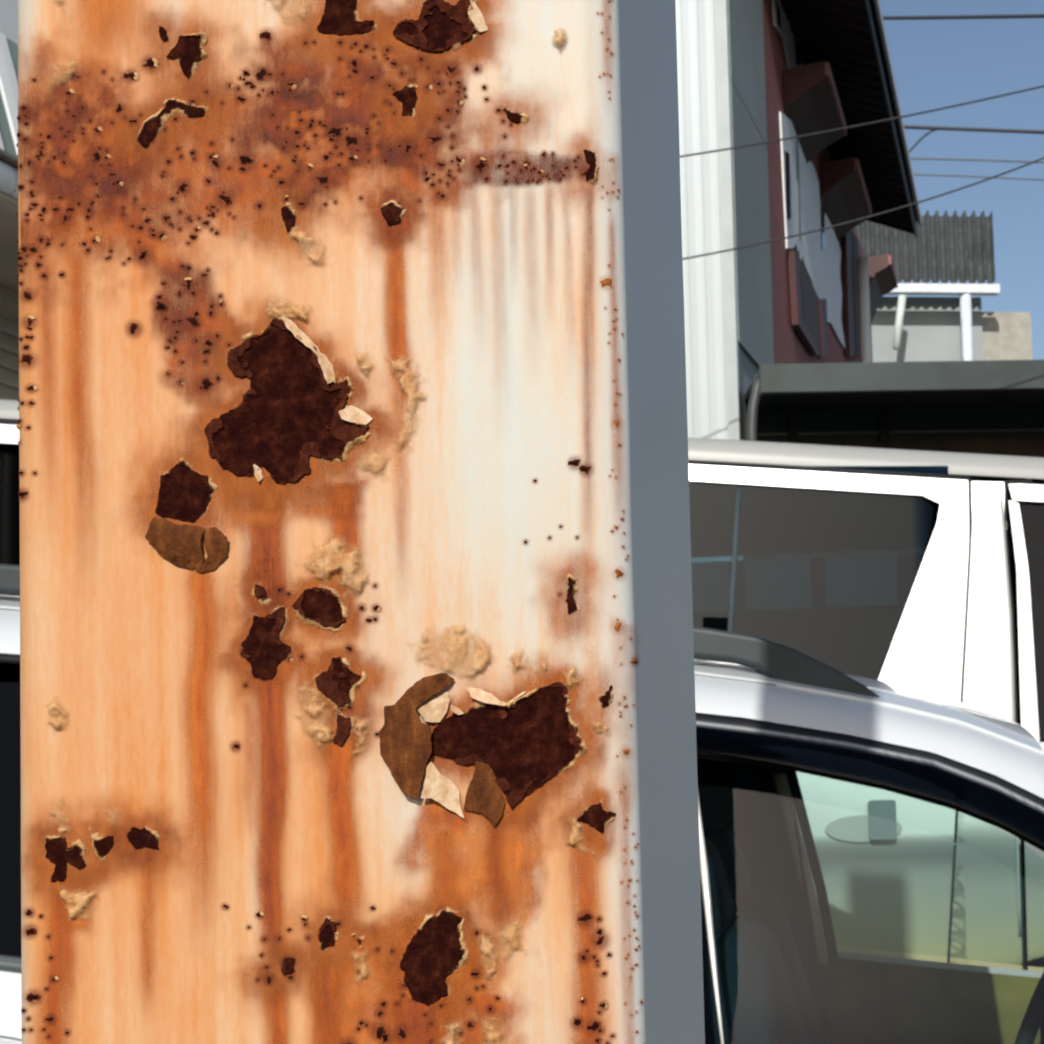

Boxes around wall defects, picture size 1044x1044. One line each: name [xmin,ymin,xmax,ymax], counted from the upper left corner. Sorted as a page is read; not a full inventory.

peeling [17,24,223,177]
spalling [17,147,235,264]
rust [18,35,583,478]
peeling [139,281,389,573]
peeling [34,812,169,895]
rust [185,569,218,870]
rust [248,677,287,952]
rust [326,737,360,912]
peeling [256,900,489,1043]
peeling [225,565,600,826]
rust [311,791,543,1044]
rust [570,839,602,1044]